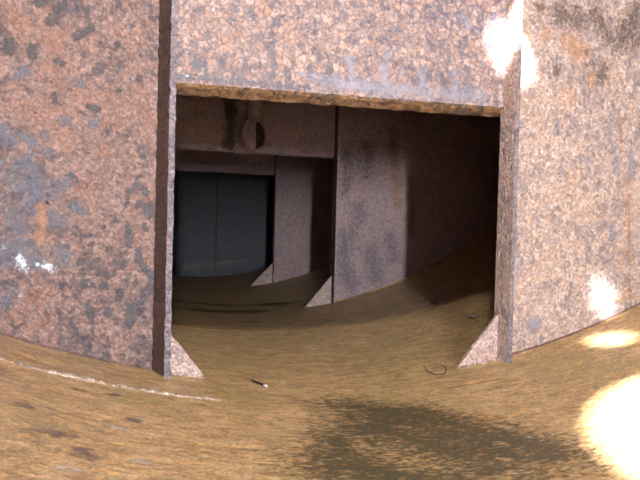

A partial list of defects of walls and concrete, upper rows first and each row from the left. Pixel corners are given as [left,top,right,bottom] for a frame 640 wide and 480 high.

leakage [0,120,87,278]
leakage [188,98,239,154]